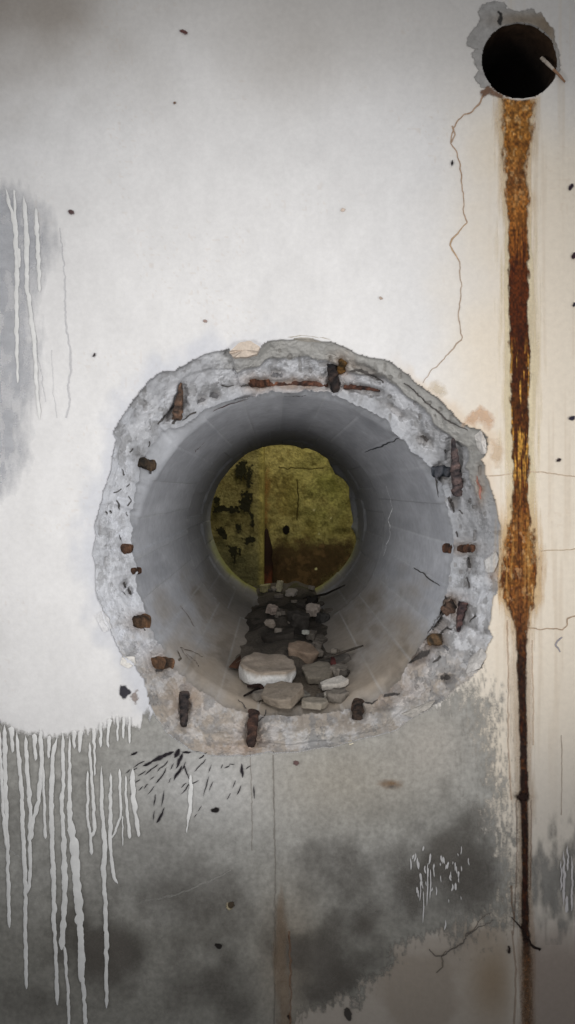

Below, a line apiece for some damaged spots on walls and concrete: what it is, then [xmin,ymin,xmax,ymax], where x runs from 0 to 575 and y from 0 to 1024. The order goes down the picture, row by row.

peeling [467,1,561,98]
leakage [6,190,41,420]
crack [423,94,484,383]
peeling [0,335,521,1024]
corrosion [498,97,542,1024]
leakage [0,715,140,1024]
leakage [410,846,469,918]